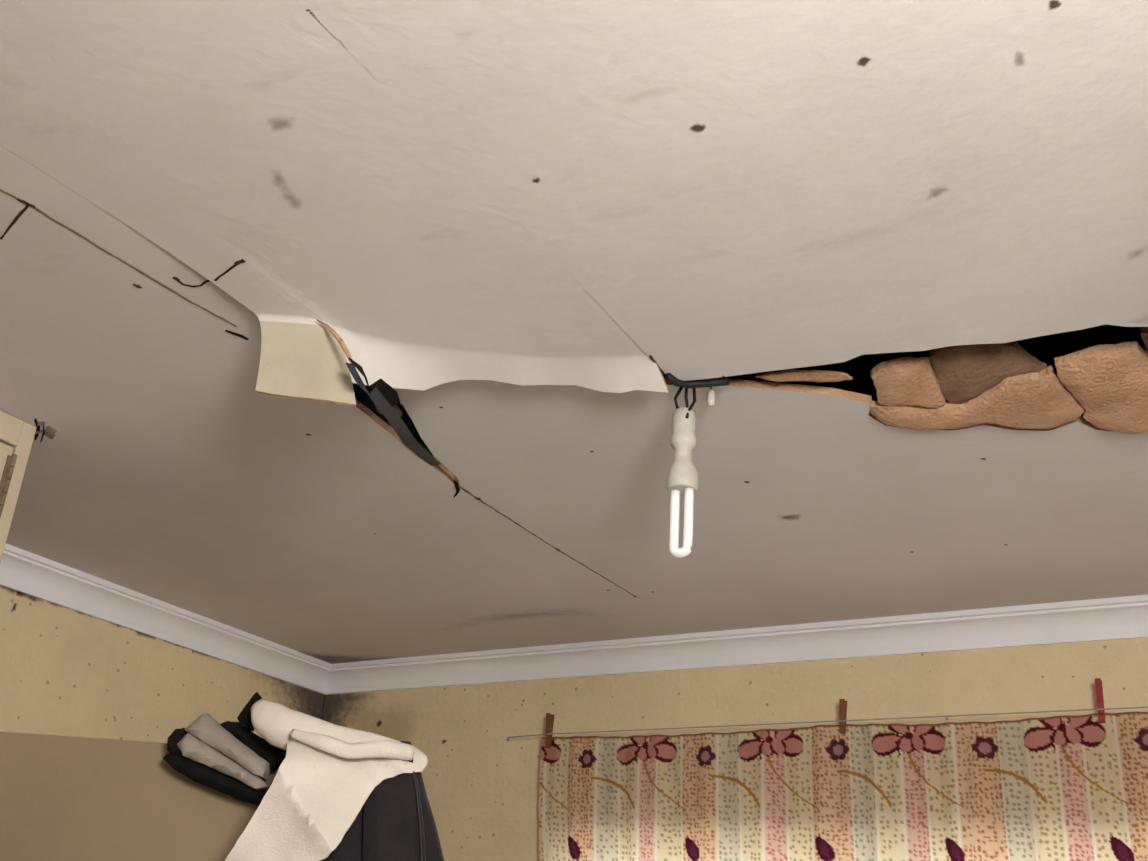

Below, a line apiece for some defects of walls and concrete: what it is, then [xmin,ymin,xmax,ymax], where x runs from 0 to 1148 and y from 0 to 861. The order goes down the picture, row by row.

crack [0,189,249,340]
crack [454,481,635,596]